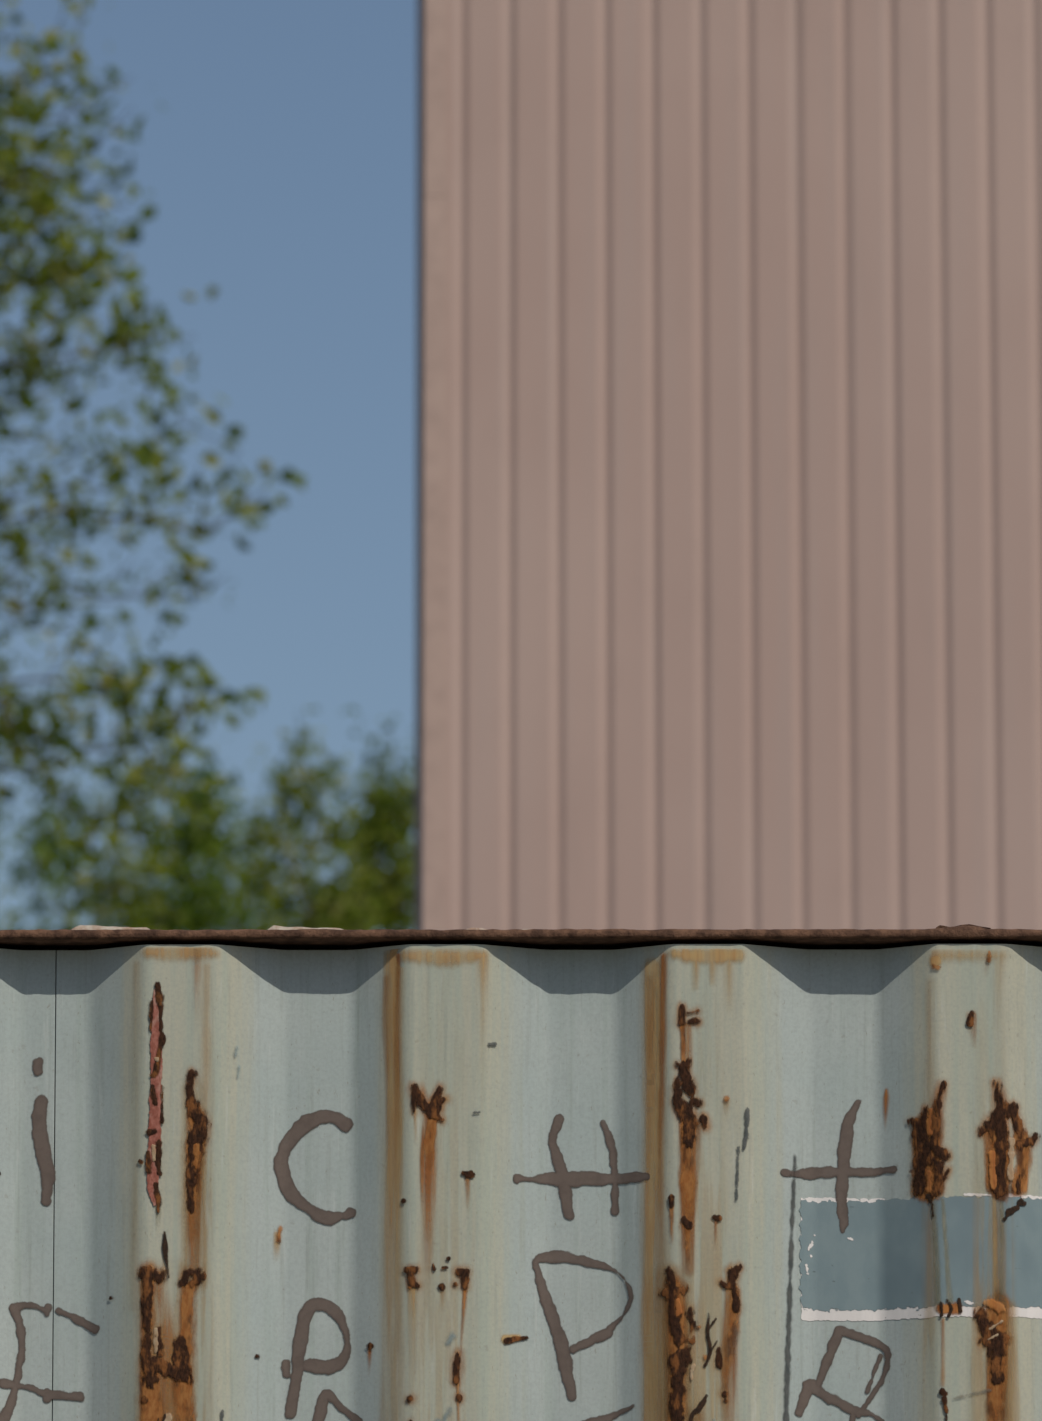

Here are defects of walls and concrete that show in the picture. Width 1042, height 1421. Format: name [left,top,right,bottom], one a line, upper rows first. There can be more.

corrosion [139,1069,212,1421]
corrosion [386,949,486,1245]
corrosion [404,1256,470,1328]
corrosion [453,1351,463,1419]
corrosion [643,949,743,1421]
corrosion [907,1080,951,1327]
corrosion [973,1080,1038,1421]